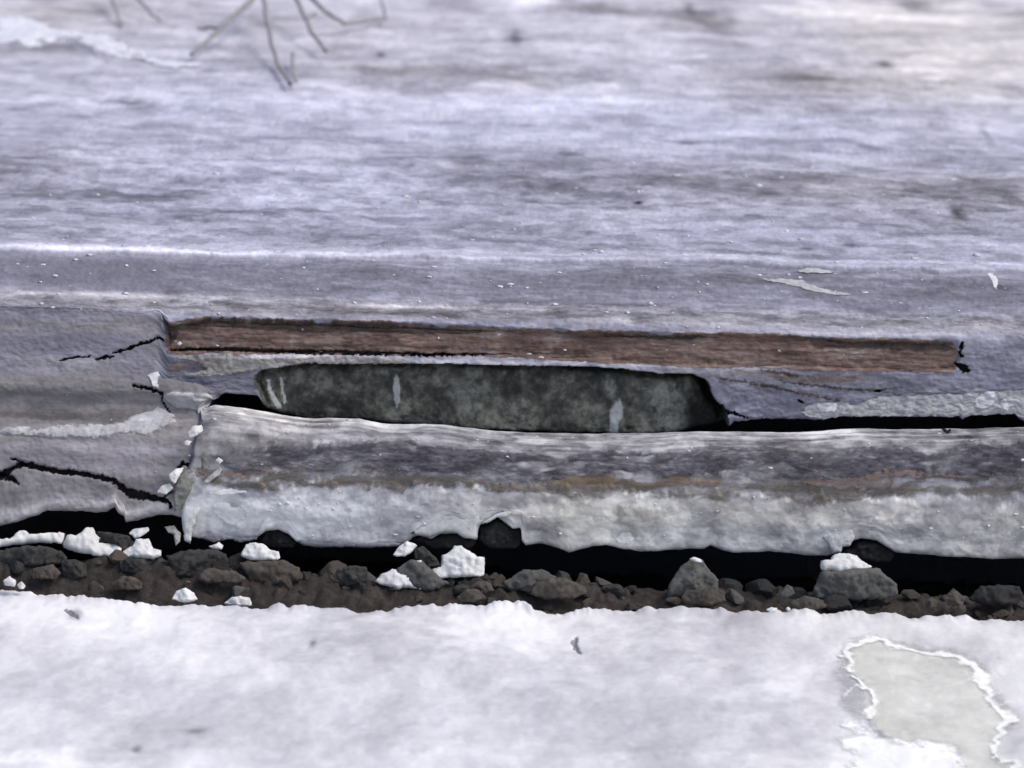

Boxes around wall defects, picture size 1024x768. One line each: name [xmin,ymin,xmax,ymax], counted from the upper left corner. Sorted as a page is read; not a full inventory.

crack [62,336,187,361]
crack [266,350,484,358]
crack [133,384,170,413]
spalling [798,389,1024,434]
crack [0,458,173,509]